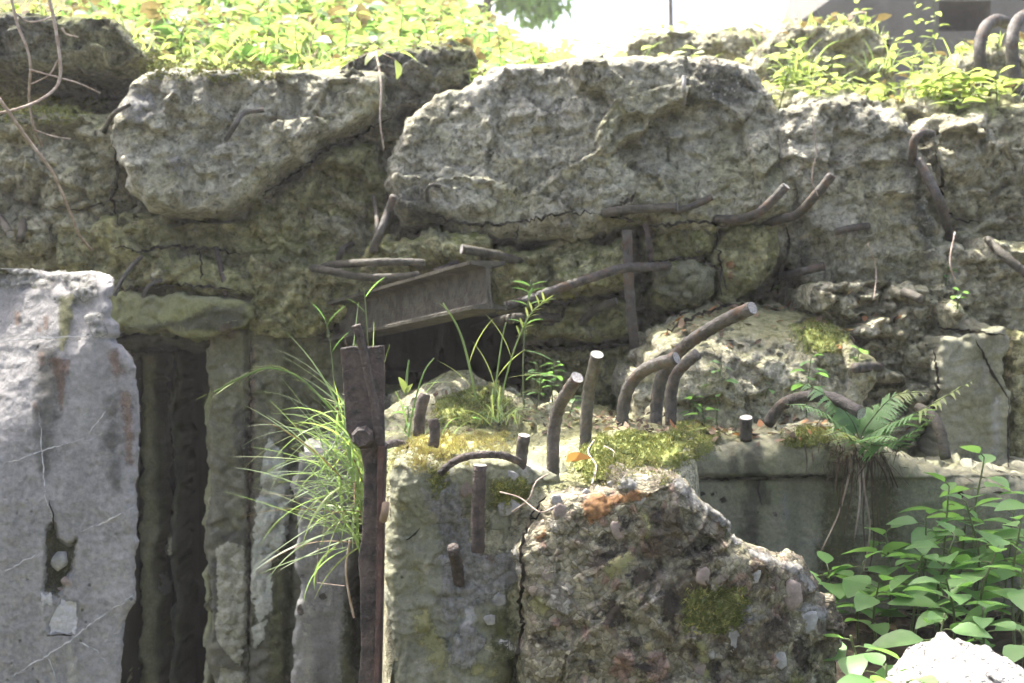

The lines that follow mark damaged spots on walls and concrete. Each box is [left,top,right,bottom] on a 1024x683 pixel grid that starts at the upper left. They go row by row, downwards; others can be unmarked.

crack [50,140,249,294]
crack [404,190,791,336]
crack [897,327,1010,467]
spalling [40,523,78,635]
crack [513,494,547,683]
corrosion [581,490,650,524]